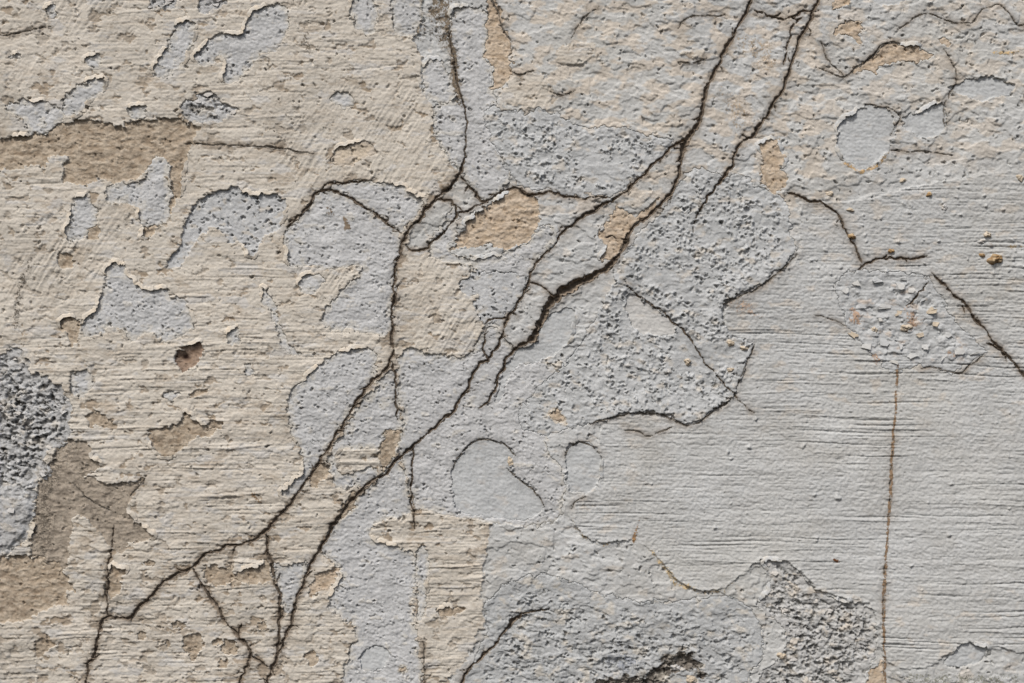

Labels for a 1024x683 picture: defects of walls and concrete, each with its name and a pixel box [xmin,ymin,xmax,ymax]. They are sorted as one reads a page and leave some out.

peeling [42,1,58,19]
spalling [0,51,238,269]
peeling [56,258,204,372]
peeling [147,0,604,683]
crack [84,0,900,683]
crack [787,192,1024,377]
peeling [833,268,988,375]
spalling [0,347,158,624]
spalling [461,556,885,683]